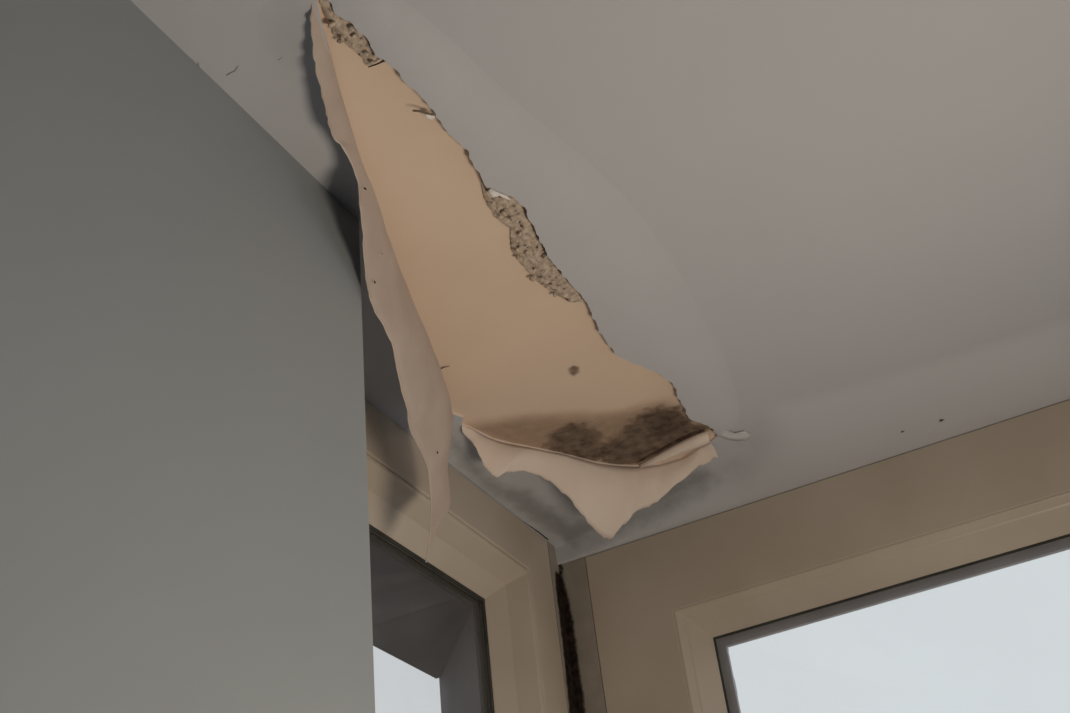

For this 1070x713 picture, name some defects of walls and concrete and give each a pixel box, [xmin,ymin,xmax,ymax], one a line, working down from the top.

peeling [310,0,751,563]
leakage [488,407,709,465]